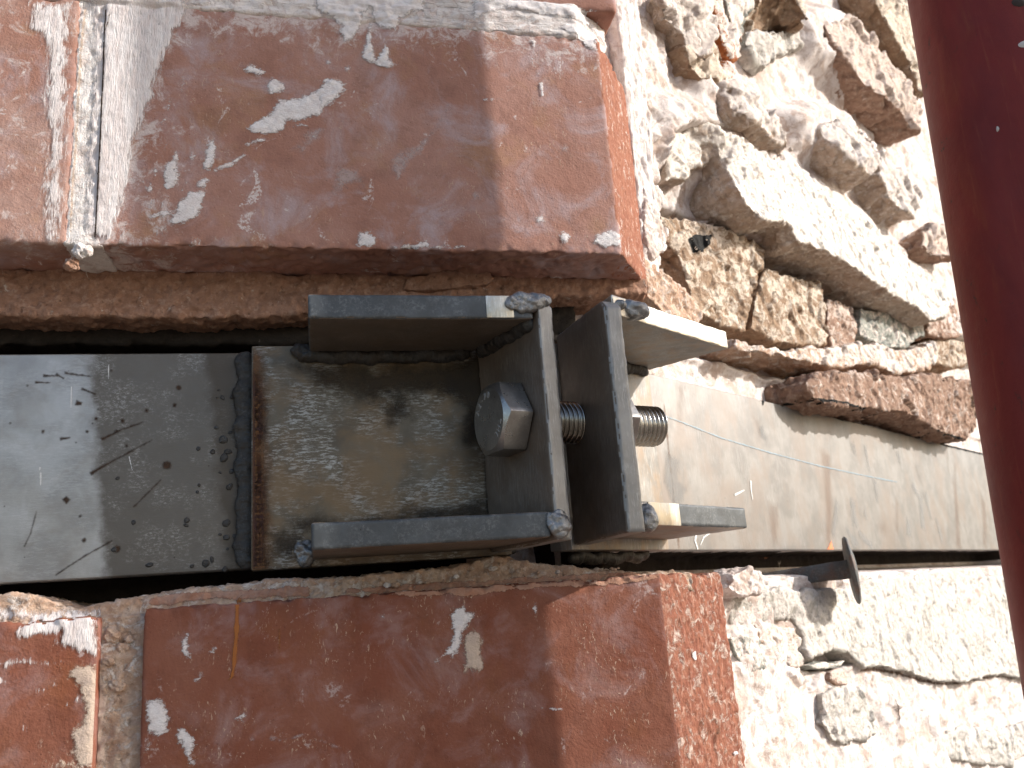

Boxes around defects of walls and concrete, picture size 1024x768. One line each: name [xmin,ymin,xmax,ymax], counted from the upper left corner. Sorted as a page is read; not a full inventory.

peeling [362,24,393,68]
peeling [243,66,285,94]
peeling [319,65,349,108]
peeling [146,138,264,192]
peeling [463,630,484,672]
peeling [56,664,110,768]